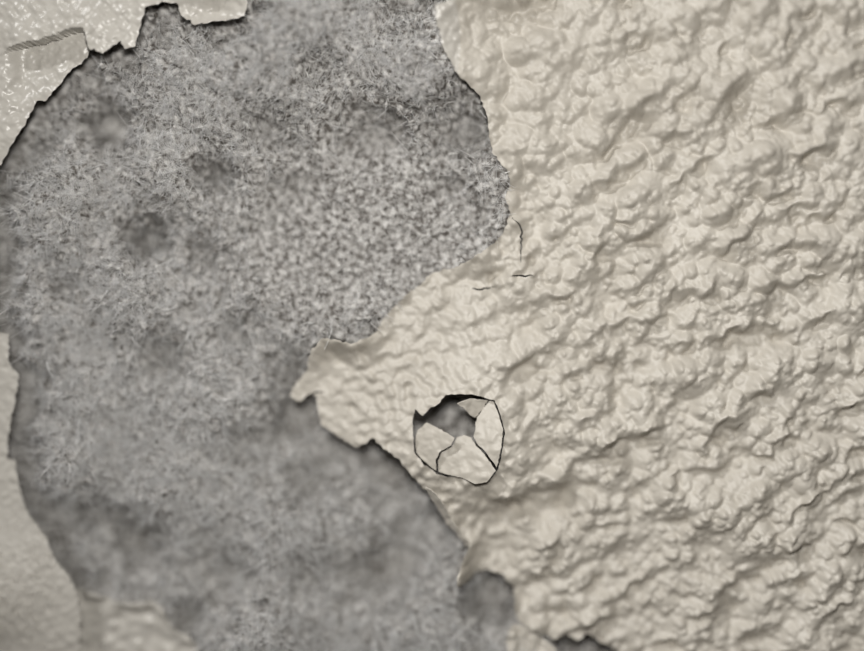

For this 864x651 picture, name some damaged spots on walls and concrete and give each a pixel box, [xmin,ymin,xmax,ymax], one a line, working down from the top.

flaking render [0,0,563,651]